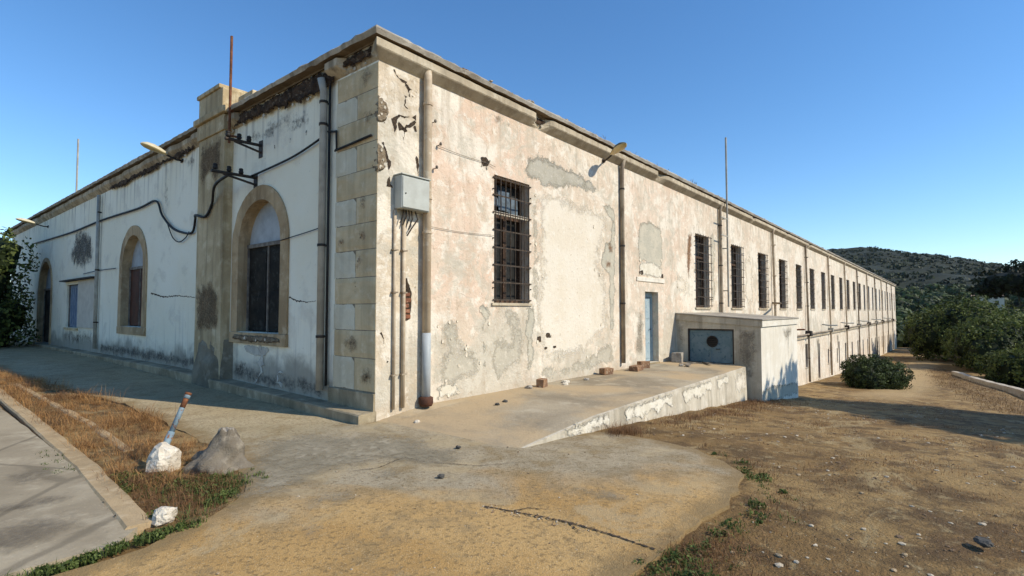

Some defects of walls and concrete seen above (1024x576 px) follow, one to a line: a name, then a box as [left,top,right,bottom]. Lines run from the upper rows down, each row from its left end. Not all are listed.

spalling [367,95,389,123]
water stain [201,141,220,181]
spalling [372,143,387,173]
water stain [72,232,92,264]
flaking render [638,221,663,278]
peeling [437,155,616,400]
water stain [197,285,217,328]
water stain [101,346,194,366]
peeling [564,413,611,437]